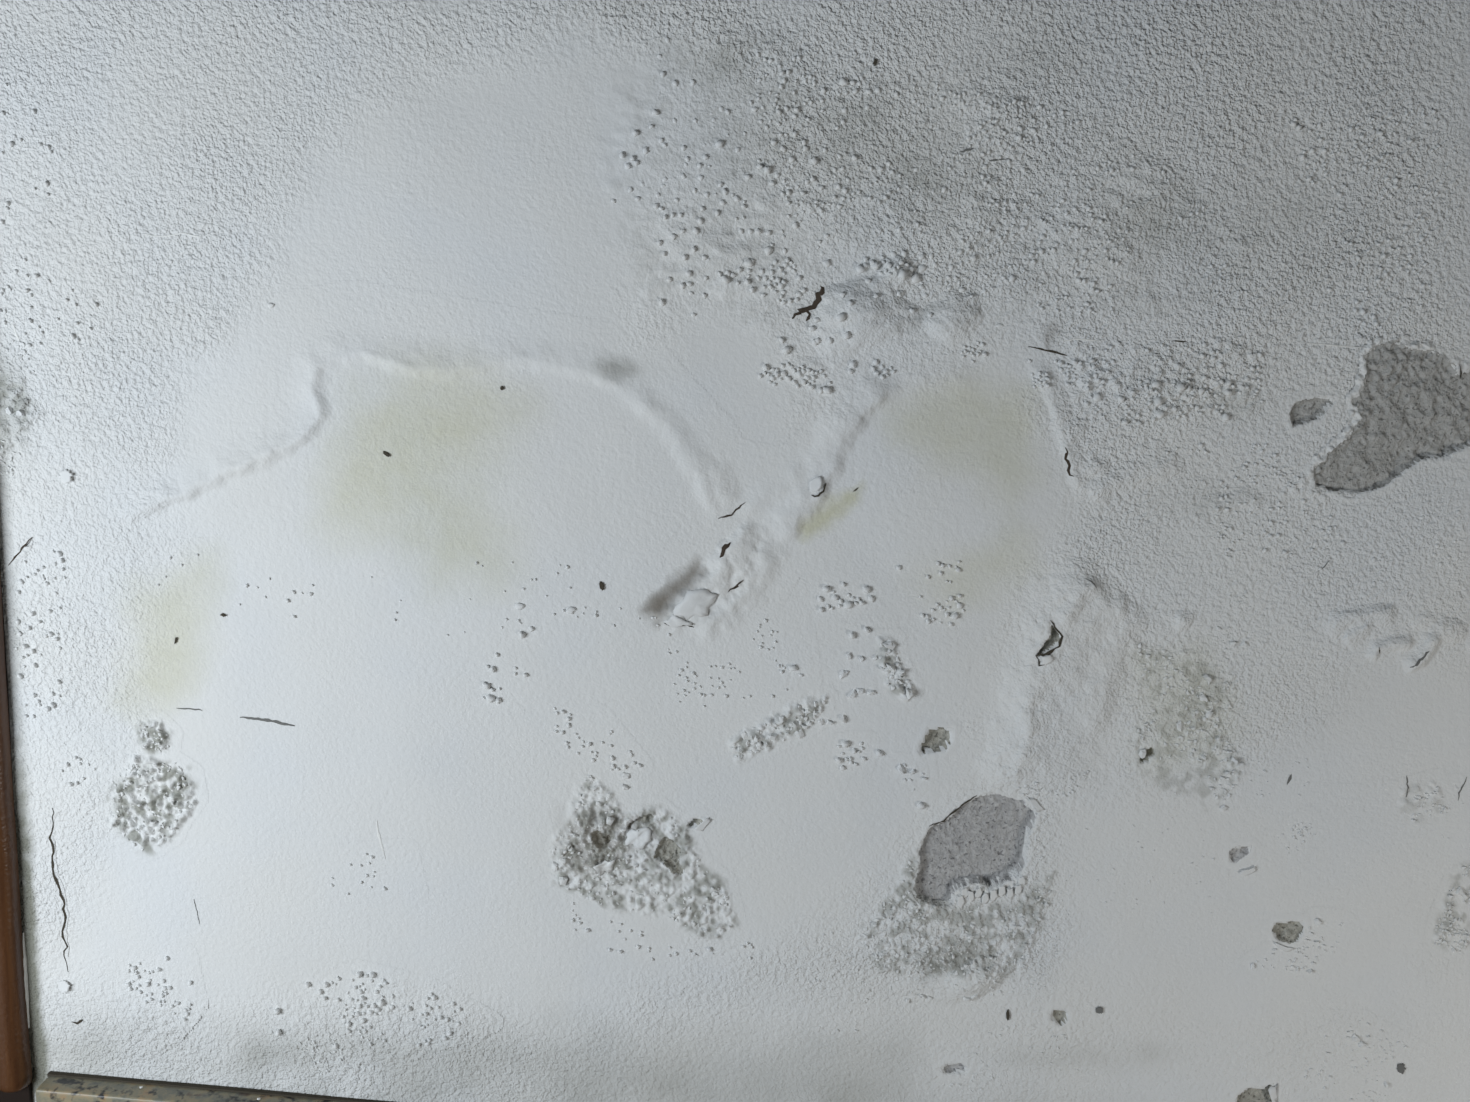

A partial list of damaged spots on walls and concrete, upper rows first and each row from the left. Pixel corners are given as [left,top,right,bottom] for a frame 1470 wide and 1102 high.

spalling [1280,334,1470,504]
spalling [717,628,961,773]
spalling [99,710,208,864]
spalling [541,766,748,950]
spalling [848,788,1077,1033]
spalling [1239,906,1357,984]
spalling [1132,643,1470,963]
spalling [931,1057,977,1082]